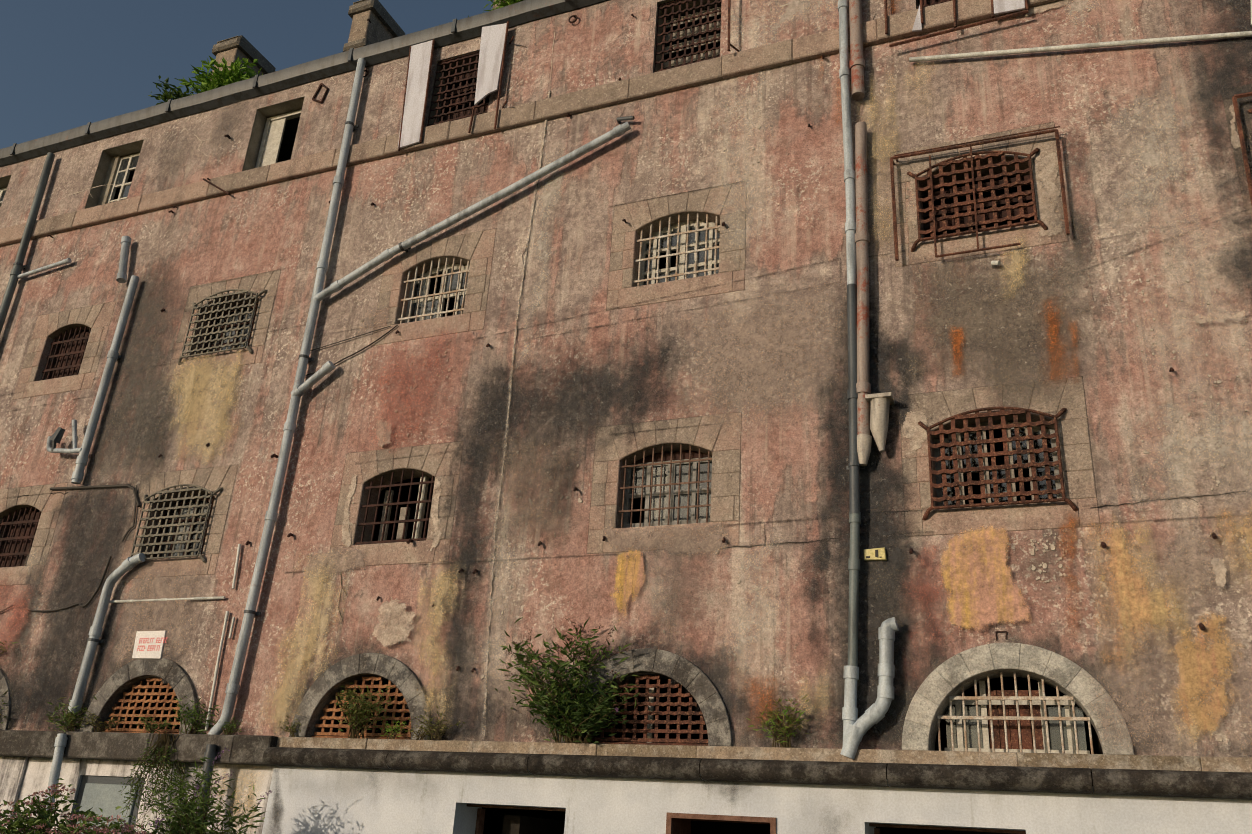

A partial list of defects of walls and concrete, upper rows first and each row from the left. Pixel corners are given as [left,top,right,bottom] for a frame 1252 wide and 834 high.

damp [1197,0,1252,197]
damp [7,264,240,732]
damp [423,343,677,674]
damp [700,261,1081,748]
peeling [370,597,416,647]
damp [425,689,513,738]
damp [1076,662,1140,747]